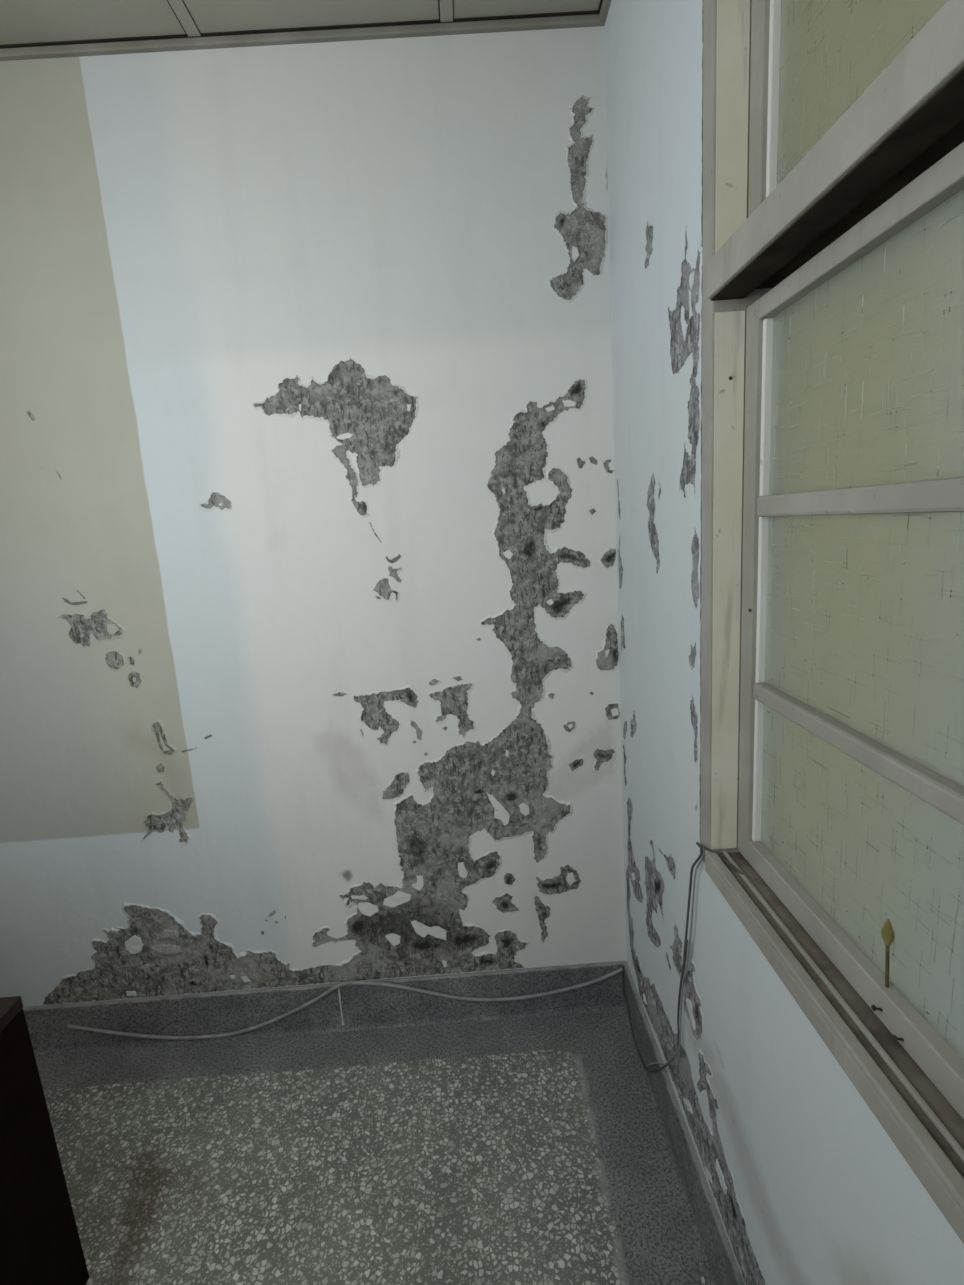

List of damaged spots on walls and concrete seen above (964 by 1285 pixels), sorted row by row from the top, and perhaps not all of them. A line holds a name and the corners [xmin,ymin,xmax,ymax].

flaking render [547,94,608,303]
peeling [668,220,702,501]
peeling [646,471,662,577]
flaking render [42,357,619,1005]
peeling [589,691,638,740]
peeling [689,693,700,767]
flaking render [625,796,766,1285]